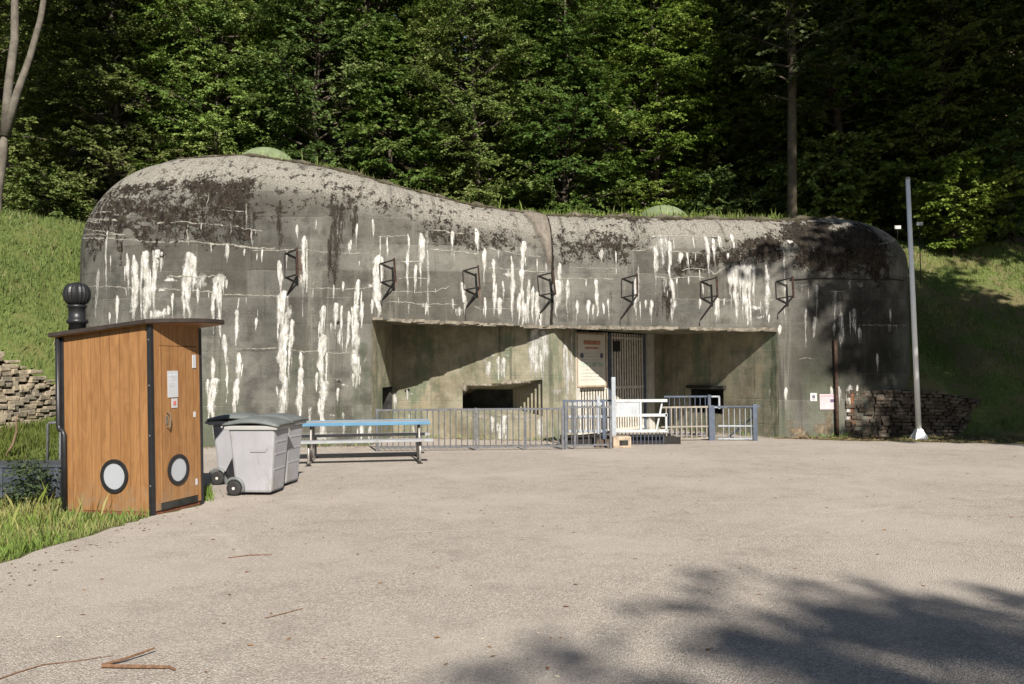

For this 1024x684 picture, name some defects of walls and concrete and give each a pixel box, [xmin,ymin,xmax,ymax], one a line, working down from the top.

water stain [95,231,243,418]
water stain [225,192,255,257]
water stain [276,200,383,440]
water stain [475,228,612,380]
water stain [630,218,689,320]
water stain [703,233,786,335]